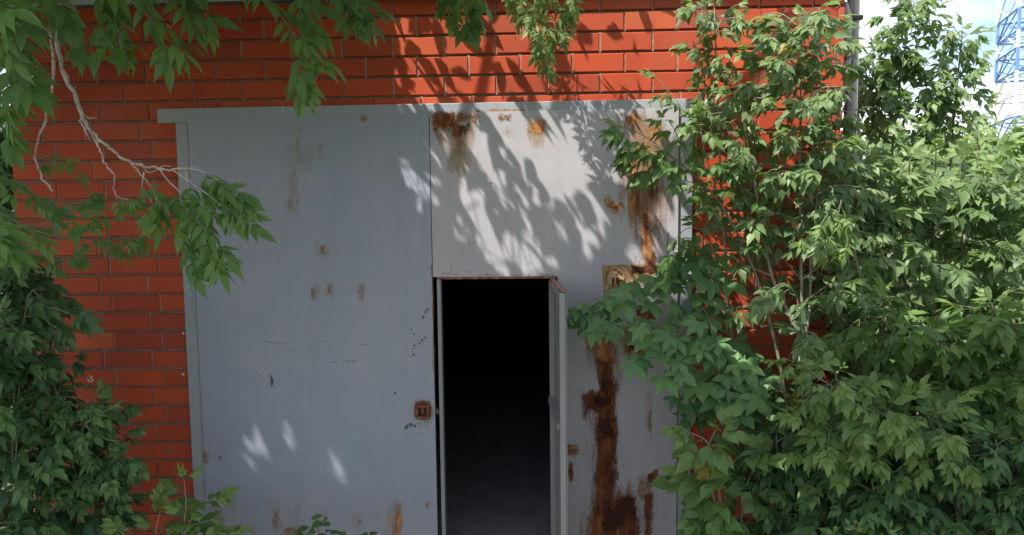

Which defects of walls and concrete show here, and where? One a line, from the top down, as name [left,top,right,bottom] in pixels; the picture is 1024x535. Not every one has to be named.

rust [431,108,523,143]
rust [528,120,545,135]
rust [605,113,669,264]
rust [581,305,658,535]
rust [392,505,403,535]